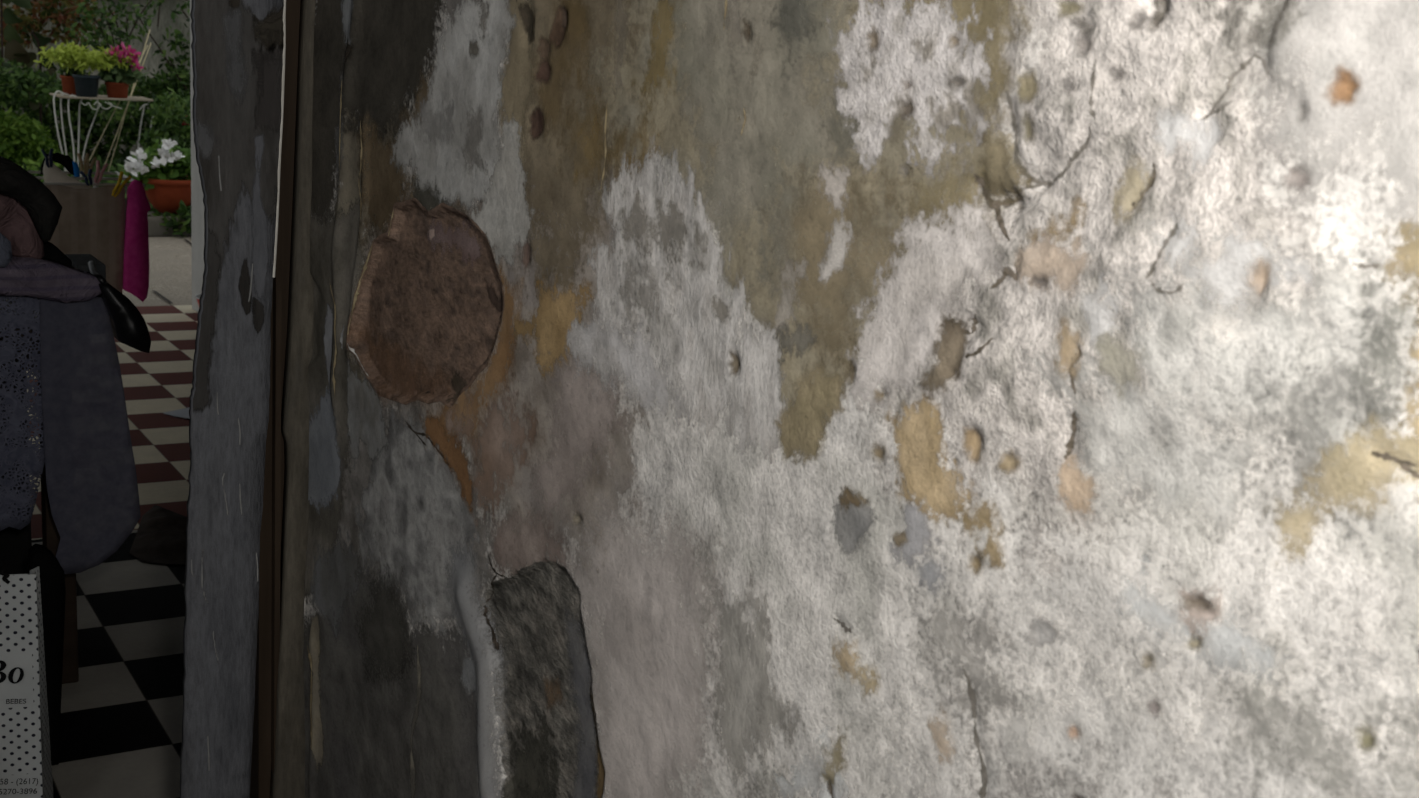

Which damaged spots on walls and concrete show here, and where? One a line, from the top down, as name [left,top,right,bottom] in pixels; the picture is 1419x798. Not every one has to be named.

leakage [469,41,478,56]
crack [1201,0,1288,120]
leakage [471,119,534,266]
crack [949,58,1096,358]
flaking render [329,0,600,798]
flaking render [921,318,967,398]
crack [962,665,988,798]